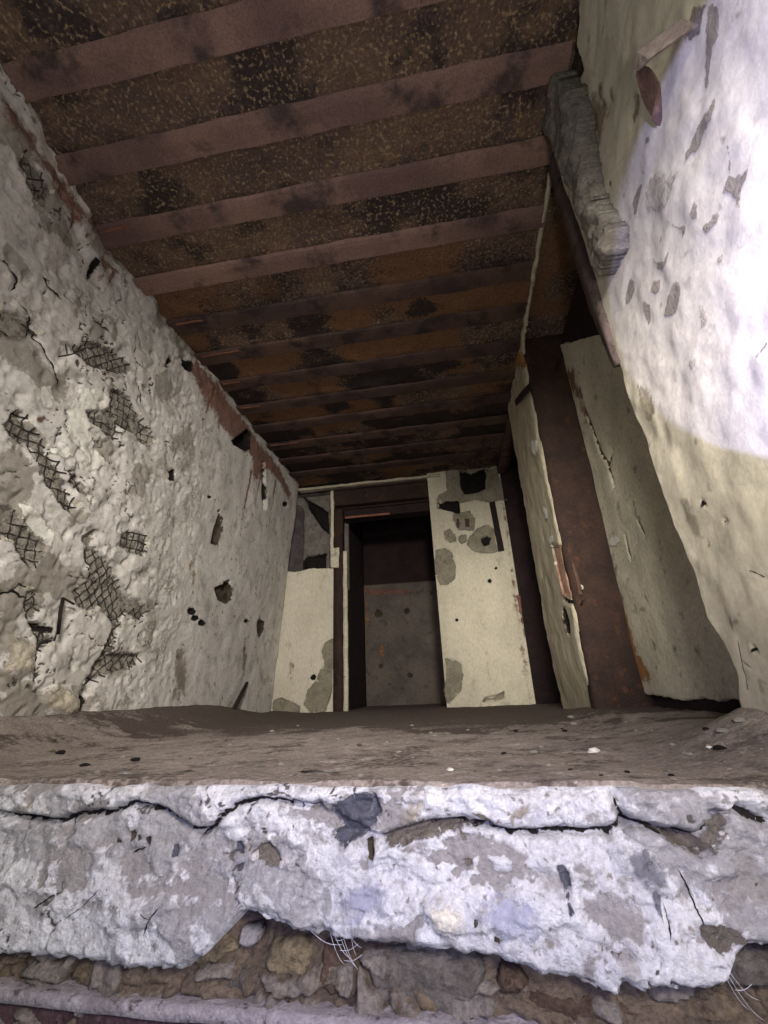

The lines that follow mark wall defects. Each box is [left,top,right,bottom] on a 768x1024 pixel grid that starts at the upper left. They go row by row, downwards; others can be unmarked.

peeling [685,5,719,88]
spalling [58,339,131,374]
peeling [2,385,156,513]
corrosion [191,350,298,520]
spalling [0,503,54,568]
spalling [434,467,507,585]
spalling [72,529,150,696]
crack [6,796,323,834]
spalling [331,792,500,848]
crack [409,797,705,834]
crack [732,805,765,823]
crack [678,870,704,924]